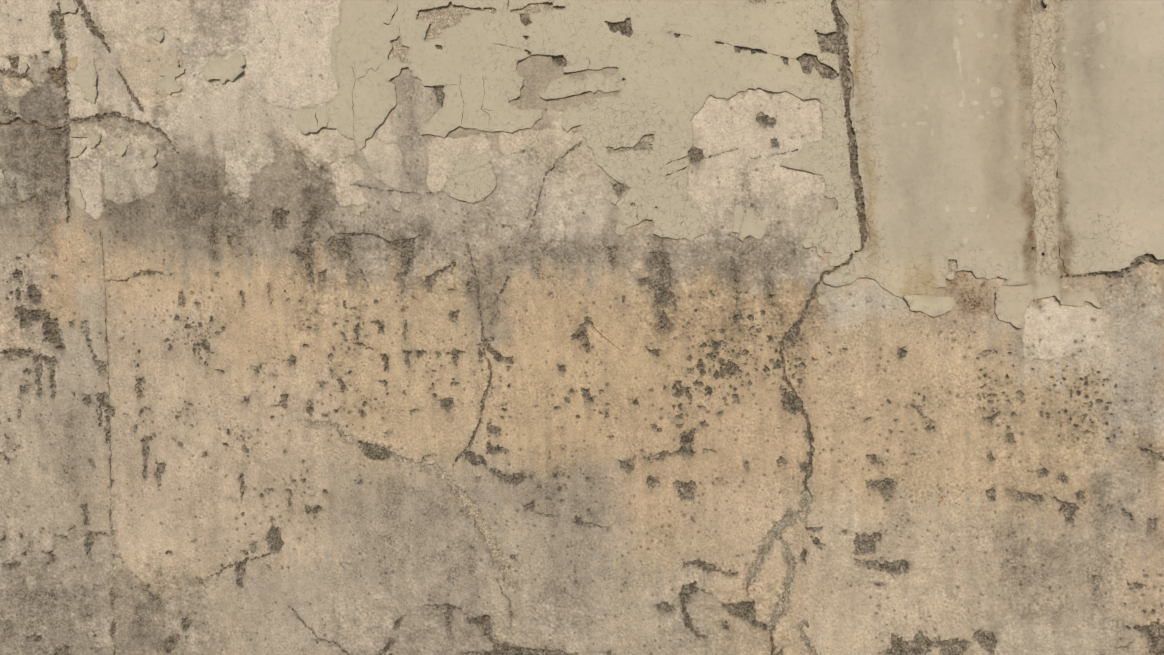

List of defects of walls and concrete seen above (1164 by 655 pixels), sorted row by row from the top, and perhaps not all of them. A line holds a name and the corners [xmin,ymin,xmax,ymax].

crack [0,0,182,223]
crack [100,232,174,655]
crack [299,142,581,630]
peeling [296,0,1164,454]
crack [666,149,798,176]
spalling [616,205,848,502]
crack [745,0,868,655]
spalling [866,454,898,502]
spalling [985,468,1086,527]
crack [1059,247,1164,278]
spalling [1138,447,1164,462]